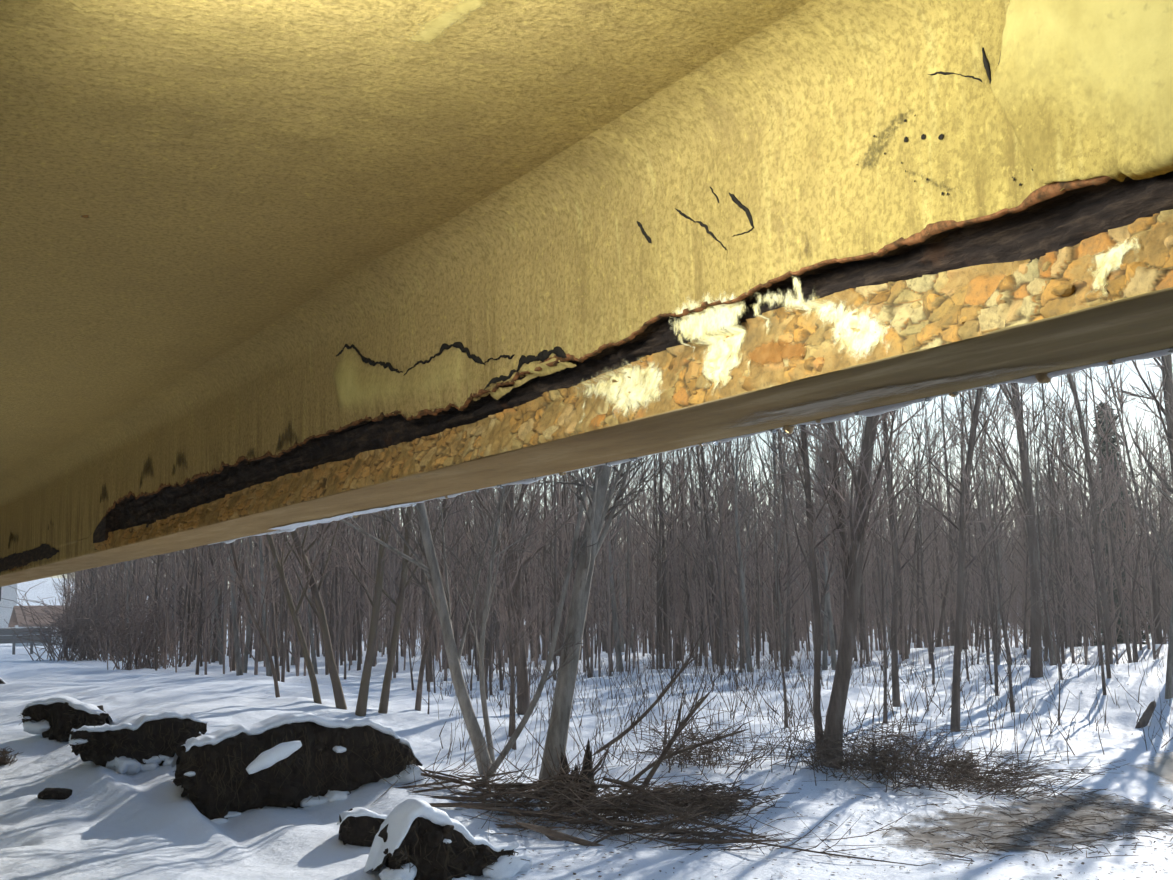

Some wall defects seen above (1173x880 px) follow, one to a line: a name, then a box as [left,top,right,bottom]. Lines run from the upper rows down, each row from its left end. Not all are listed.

crack [928,47,995,100]
crack [636,187,754,265]
spalling [91,0,1173,554]
water stain [674,278,891,389]
water stain [577,363,662,422]
spalling [0,544,59,573]